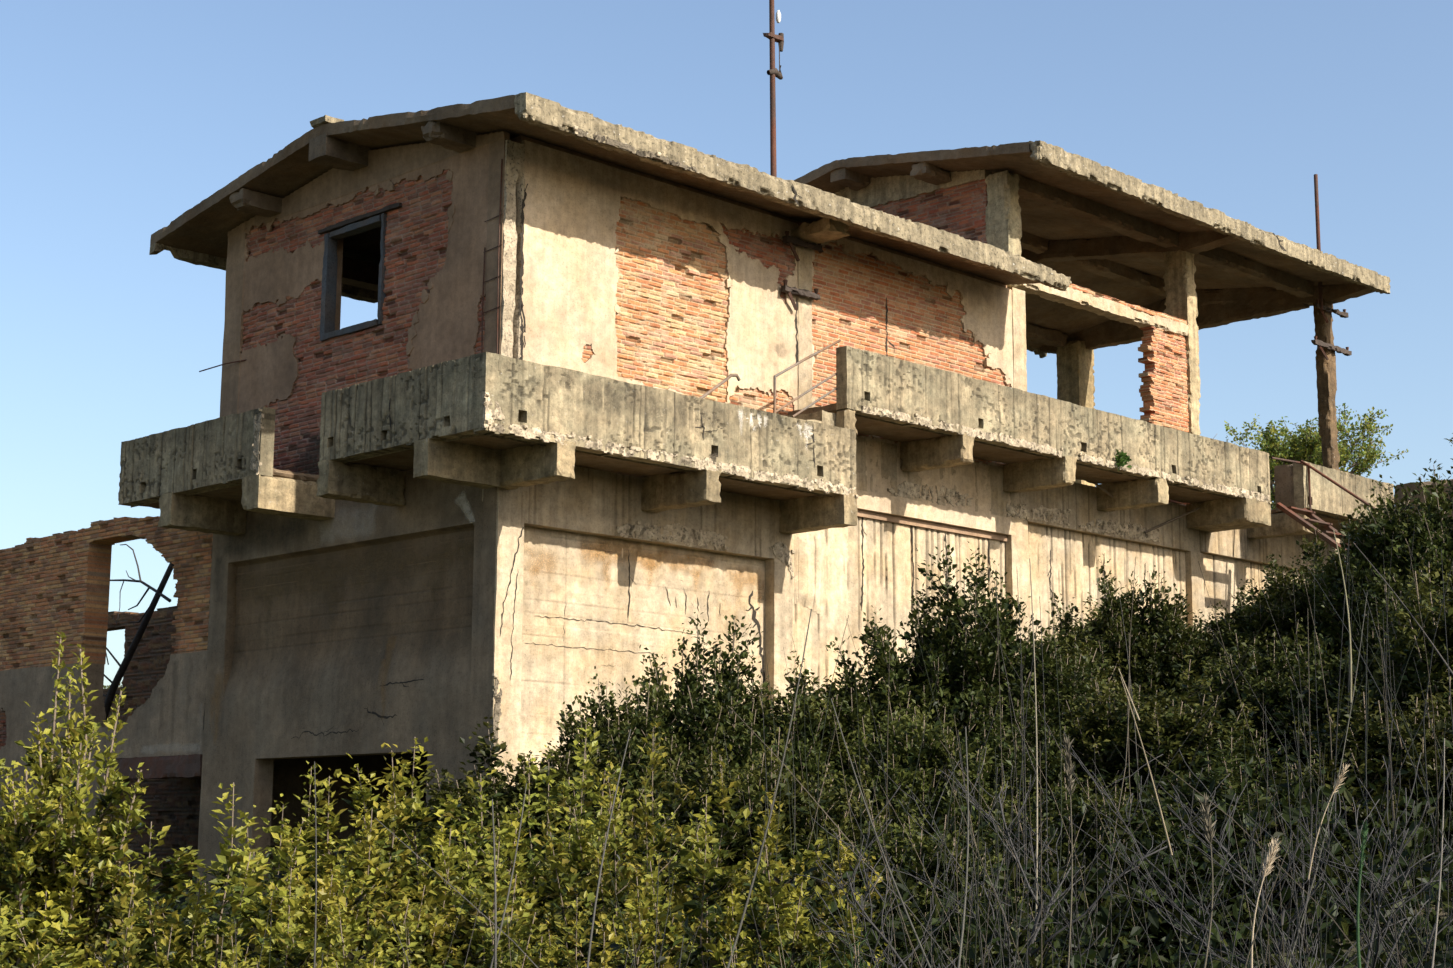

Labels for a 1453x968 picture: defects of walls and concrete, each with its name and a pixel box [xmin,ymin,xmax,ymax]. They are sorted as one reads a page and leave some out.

flaking render [199,169,455,475]
flaking render [614,197,1011,416]
spalling [861,406,1271,507]
crack [500,528,765,685]
spalling [616,521,729,551]